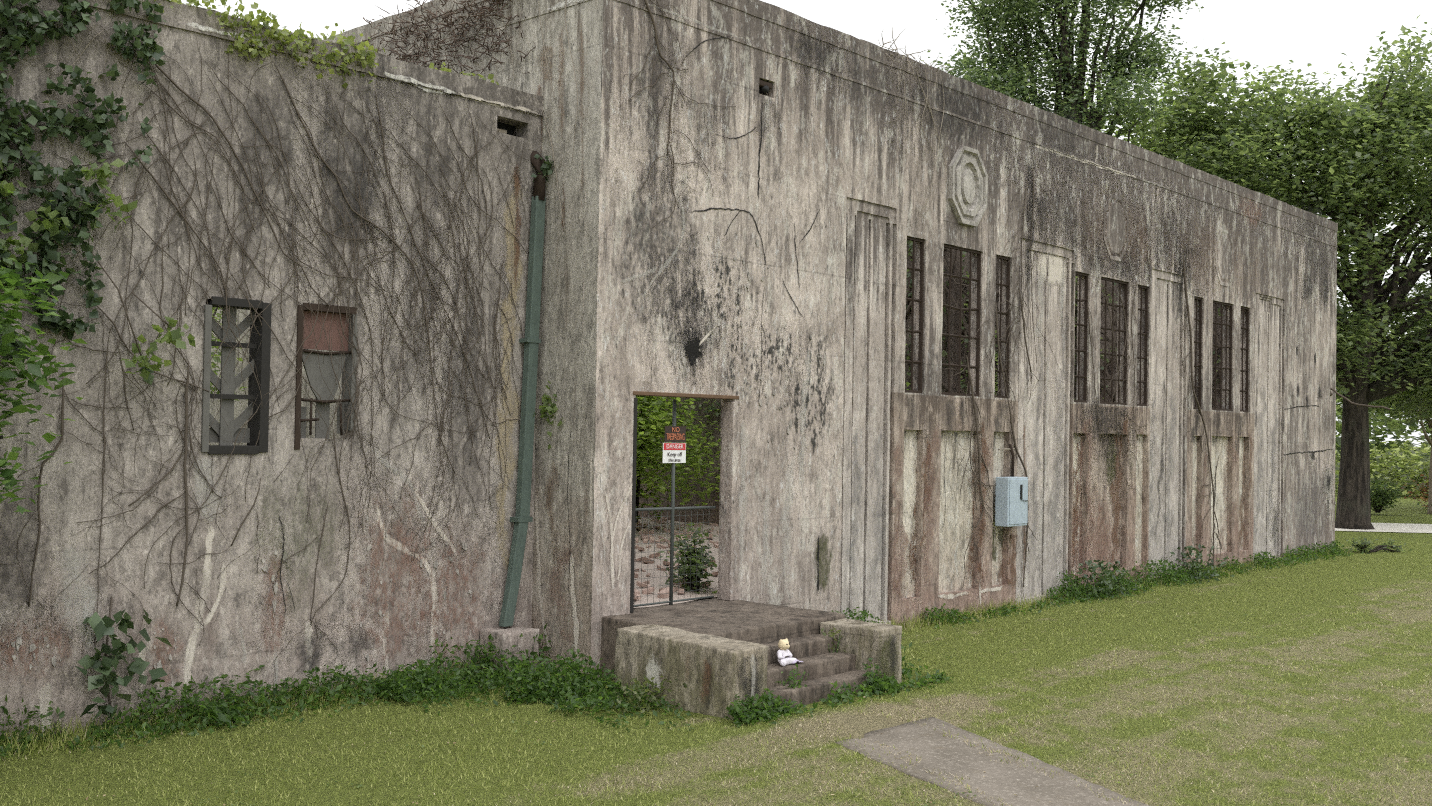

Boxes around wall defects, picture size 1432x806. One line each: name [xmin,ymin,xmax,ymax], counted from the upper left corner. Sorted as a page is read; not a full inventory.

water stain [623,155,717,358]
water stain [1026,146,1134,284]
rust [909,442,930,578]
rust [968,428,1026,586]
rust [1071,421,1128,580]
water stain [184,527,226,692]